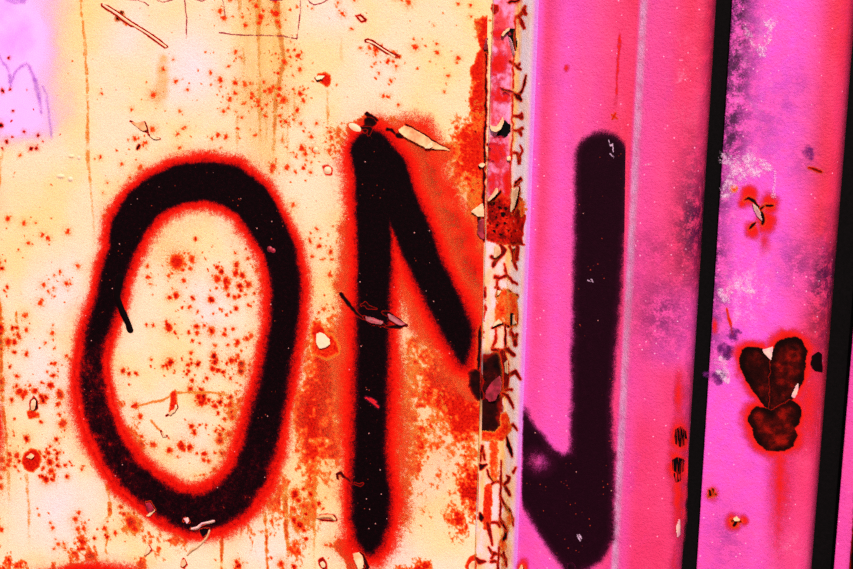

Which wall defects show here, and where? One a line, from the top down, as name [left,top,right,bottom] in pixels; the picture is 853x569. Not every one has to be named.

rust [0,284,91,495]
rust [117,248,262,477]
rust [240,225,357,569]
peeling [316,332,330,349]
peeling [365,314,405,326]
peeling [399,123,451,152]
rust [399,333,512,545]
rust [438,2,528,271]
peeling [468,361,508,402]
rust [481,285,518,353]
rust [730,185,779,247]
rust [733,328,823,548]